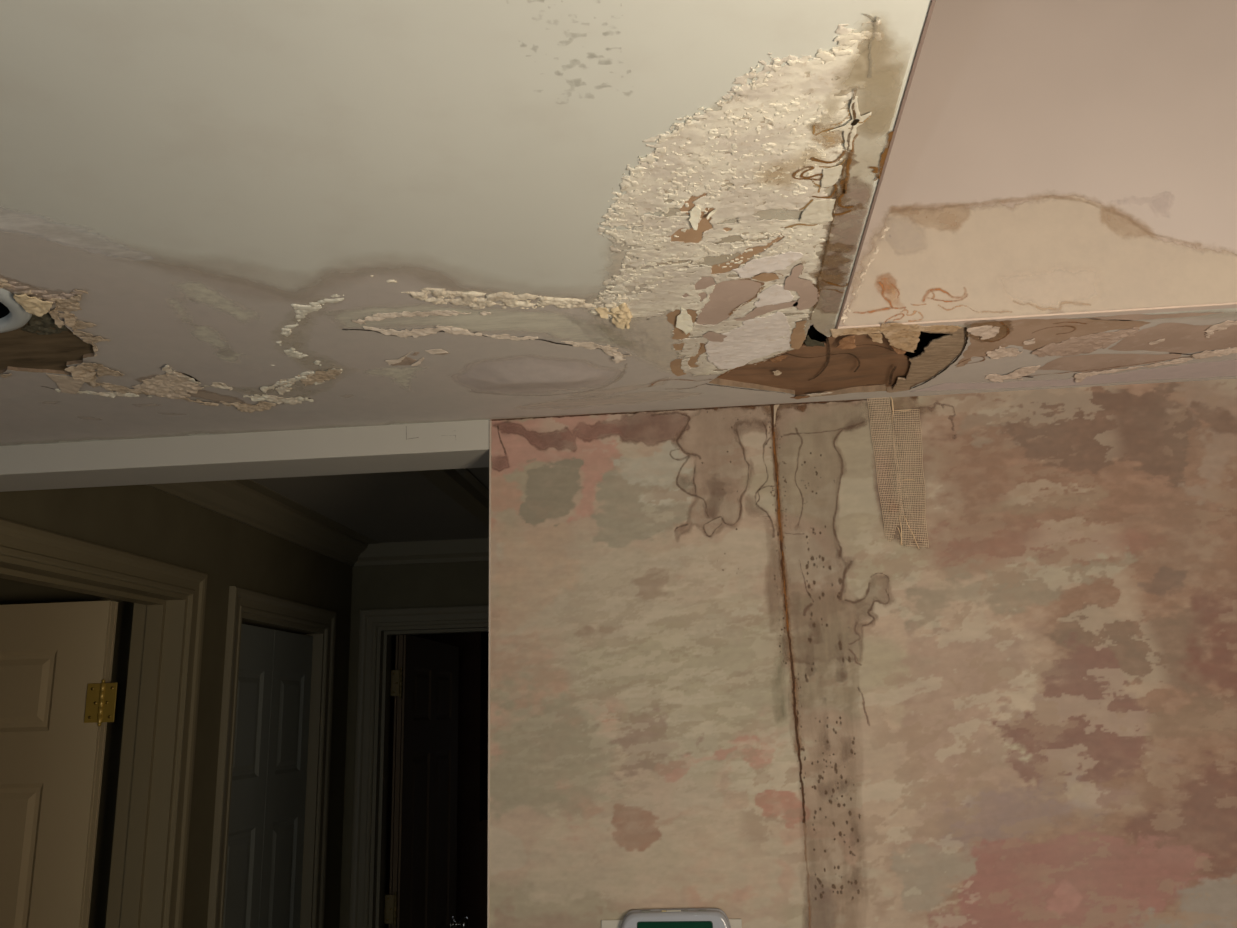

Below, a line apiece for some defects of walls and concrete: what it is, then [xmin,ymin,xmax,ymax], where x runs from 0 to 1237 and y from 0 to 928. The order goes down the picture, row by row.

peeling [0,278,342,413]
water stain [0,20,1237,548]
peeling [669,193,731,243]
peeling [666,234,827,376]
peeling [841,226,890,323]
spalling [905,331,948,358]
peeling [913,312,1237,392]
crack [492,14,917,928]
water stain [802,518,874,665]
water stain [797,705,860,855]